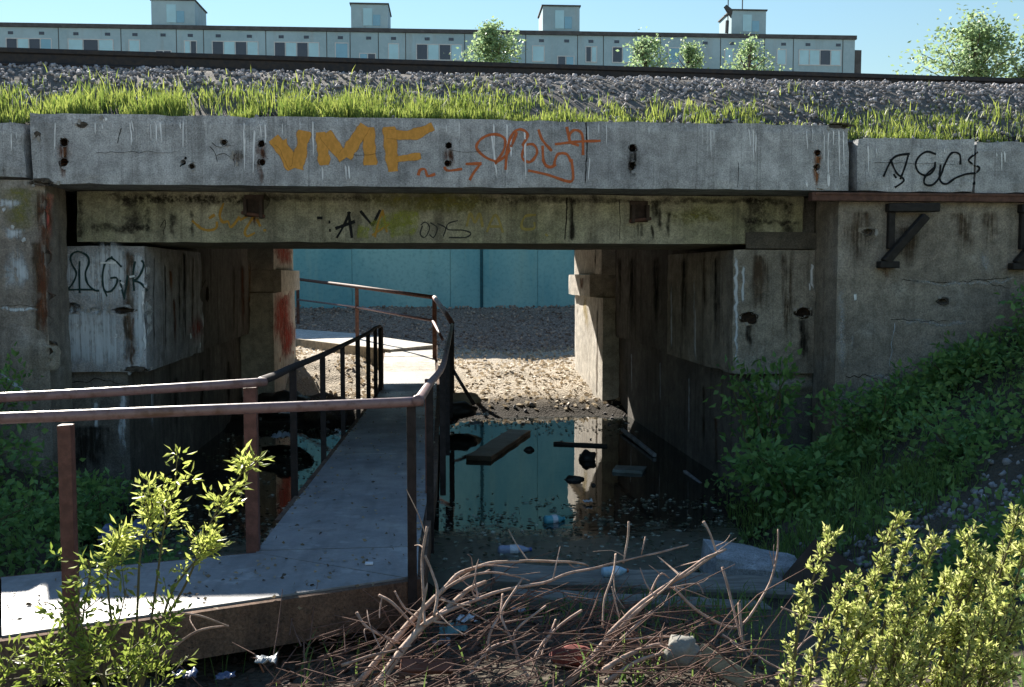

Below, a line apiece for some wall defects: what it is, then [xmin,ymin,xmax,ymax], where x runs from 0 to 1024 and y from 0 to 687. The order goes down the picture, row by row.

corrosion [813,150,821,183]
leakage [78,193,224,236]
leakage [479,196,636,239]
corrosion [32,196,56,330]